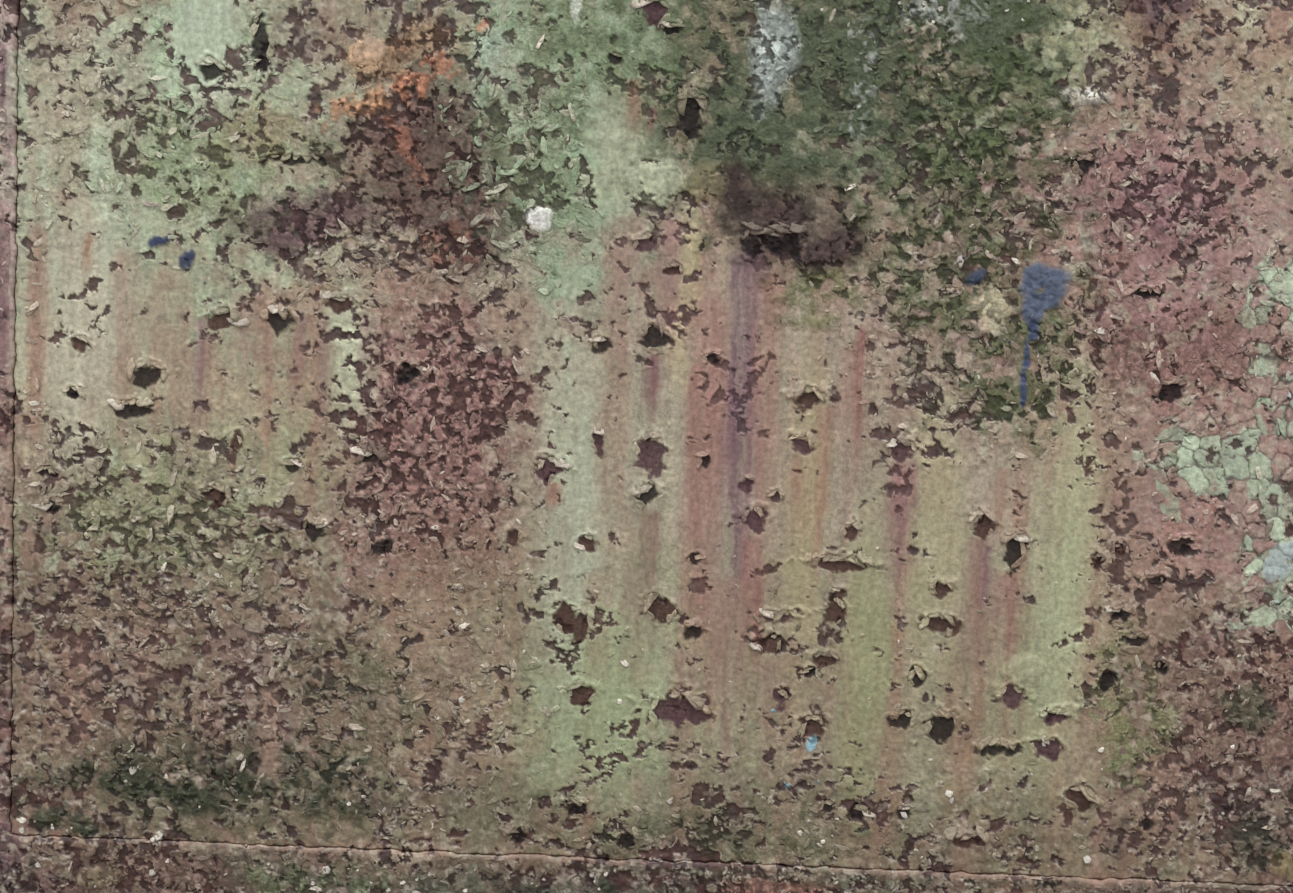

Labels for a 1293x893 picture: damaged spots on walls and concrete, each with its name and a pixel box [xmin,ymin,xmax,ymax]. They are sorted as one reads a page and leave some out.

corrosion [0,192,56,450]
peeling [0,0,297,263]
corrosion [80,0,538,630]
corrosion [1100,0,1206,66]
corrosion [1042,136,1277,265]
peeling [0,323,1108,893]
corrosion [534,475,575,657]
corrosion [593,154,878,790]
corrosion [879,458,921,599]
corrosion [958,467,1030,696]
corrosion [1070,271,1293,876]